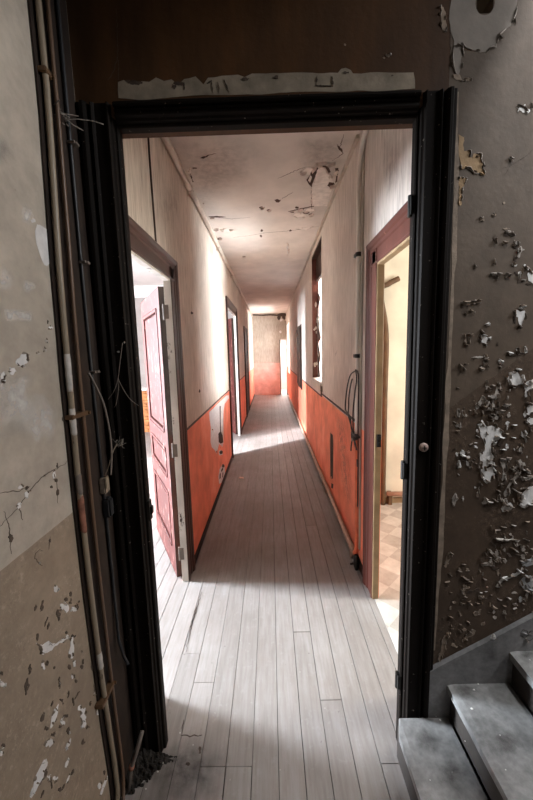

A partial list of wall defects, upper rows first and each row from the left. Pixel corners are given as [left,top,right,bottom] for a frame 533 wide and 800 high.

flaking render [439,0,517,82]
flaking render [118,68,415,100]
peeling [288,162,339,218]
peeling [0,320,53,384]
peeling [434,92,533,662]
peeling [209,395,229,484]
crack [1,463,66,554]
peeling [58,592,80,617]
peeling [36,631,84,683]
peeling [30,692,99,798]